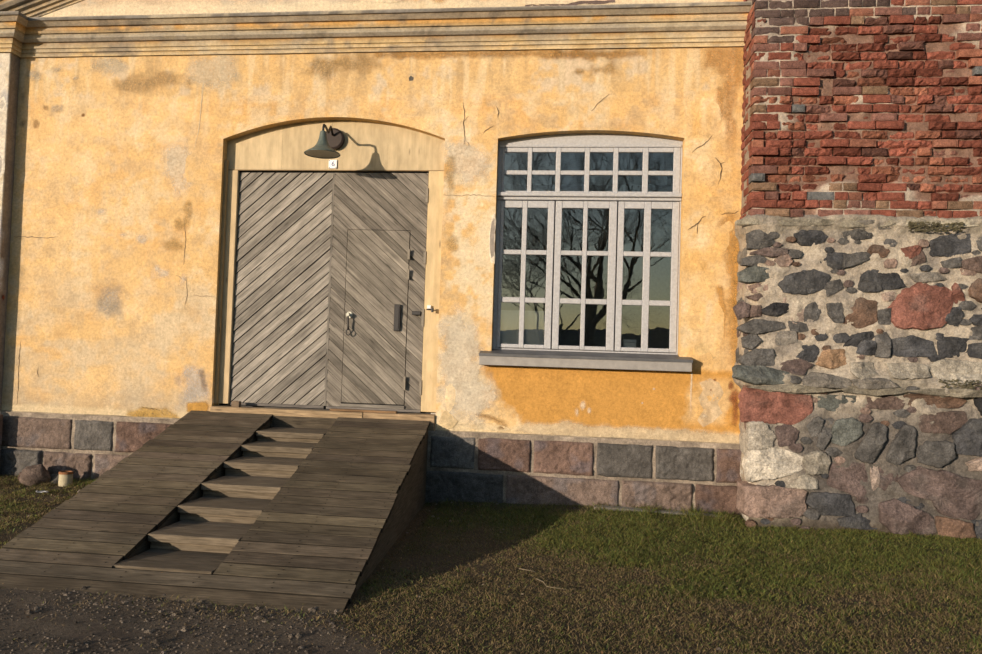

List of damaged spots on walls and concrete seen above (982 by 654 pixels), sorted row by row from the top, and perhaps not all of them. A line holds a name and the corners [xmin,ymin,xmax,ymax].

crack [462,105,499,150]
crack [692,135,725,184]
crack [176,222,212,309]